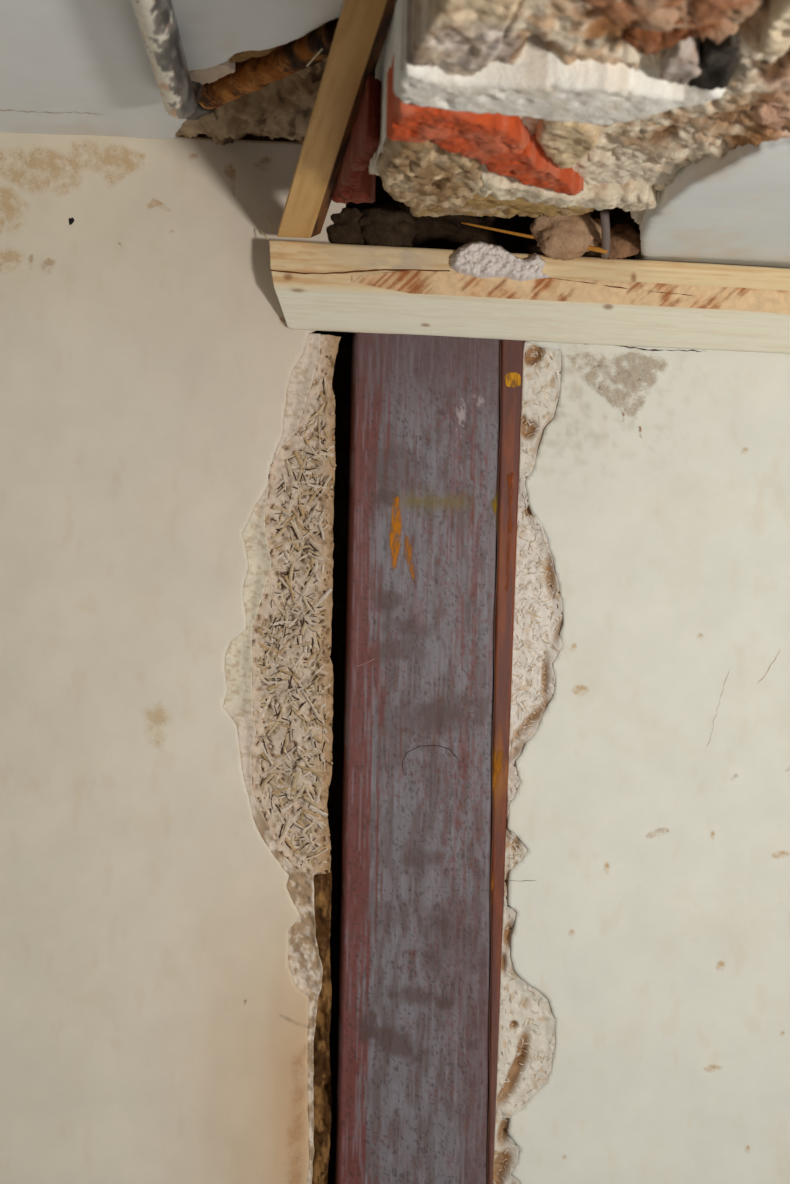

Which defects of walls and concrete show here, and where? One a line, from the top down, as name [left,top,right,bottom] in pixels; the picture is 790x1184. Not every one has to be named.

flaking render [331,0,790,230]
corrosion [506,372,521,387]
corrosion [390,497,414,578]
flaking render [223,331,350,1184]